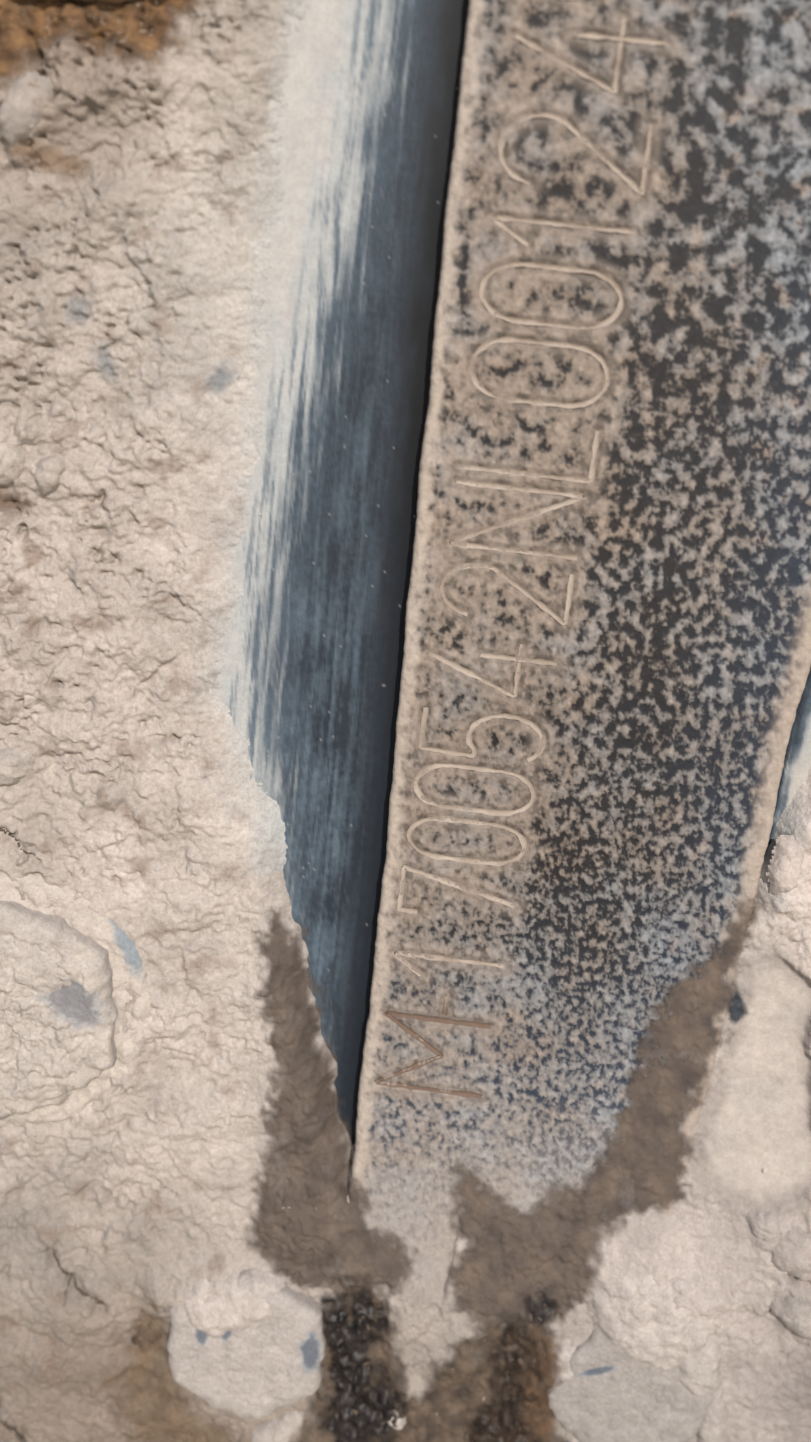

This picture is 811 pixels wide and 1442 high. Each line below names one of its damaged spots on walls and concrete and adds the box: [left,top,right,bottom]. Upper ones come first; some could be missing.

rust [0,0,193,76]
leakage [253,905,756,1442]